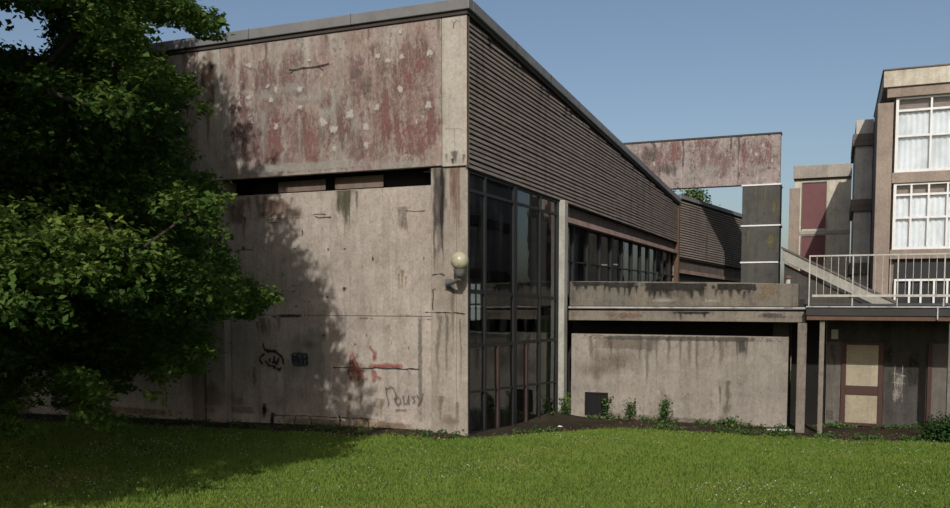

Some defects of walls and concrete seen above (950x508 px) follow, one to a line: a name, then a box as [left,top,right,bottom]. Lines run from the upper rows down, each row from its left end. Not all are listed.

peeling [229,29,436,167]
damp [572,282,756,302]
damp [604,336,777,380]